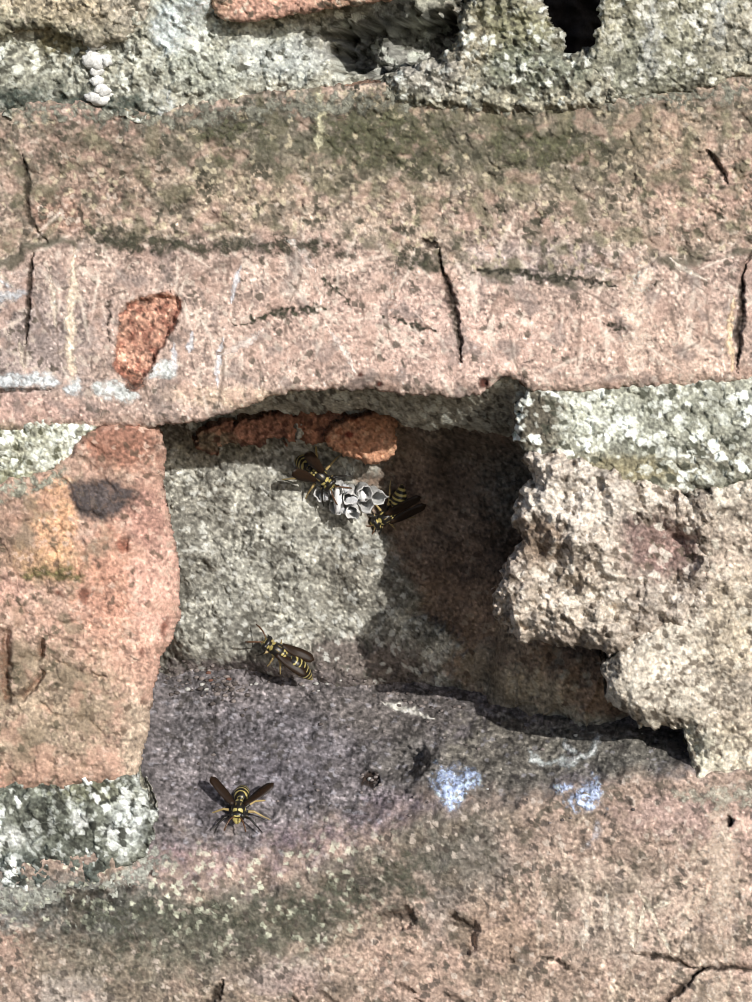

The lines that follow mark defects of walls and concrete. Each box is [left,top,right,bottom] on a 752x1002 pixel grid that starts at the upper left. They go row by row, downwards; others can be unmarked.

damp [82,45,117,106]
crack [22,155,41,236]
crack [708,149,728,182]
crack [25,258,33,345]
crack [382,240,617,362]
crack [603,322,626,331]
crack [683,248,752,371]
spalling [361,772,380,788]
crack [539,956,573,970]
crack [632,952,752,1002]